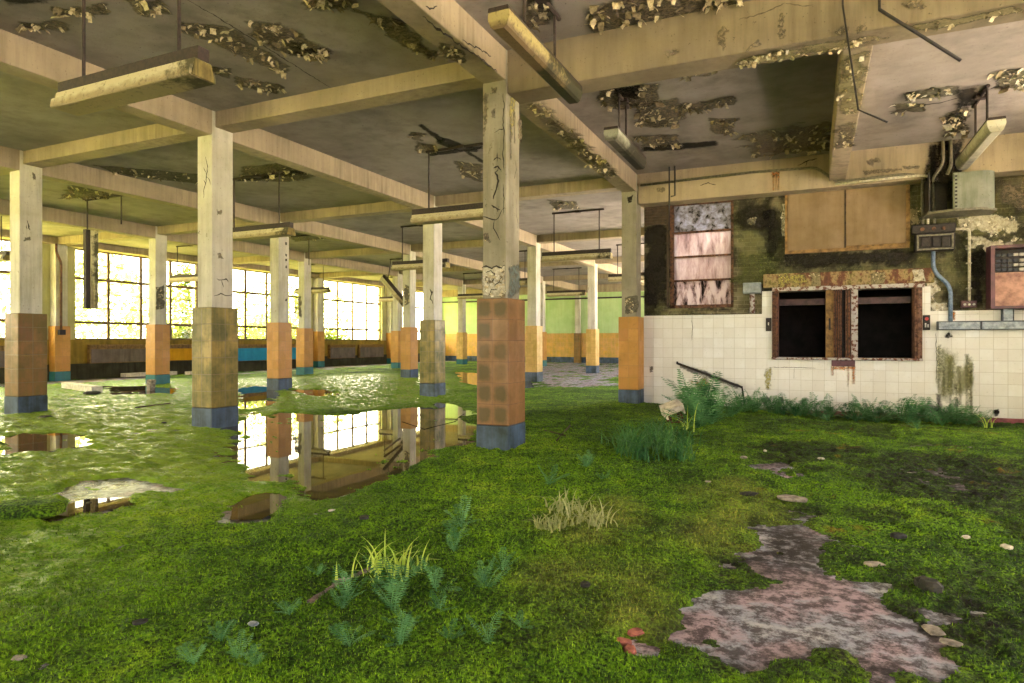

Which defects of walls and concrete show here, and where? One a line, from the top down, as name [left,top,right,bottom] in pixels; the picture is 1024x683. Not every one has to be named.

peeling [584,0,743,35]
peeling [94,165,198,184]
peeling [181,20,332,96]
crack [483,100,518,240]
peeling [528,102,616,180]
peeling [596,13,888,159]
peeling [890,86,959,116]
peeling [939,107,970,139]
water stain [730,196,914,270]
peeling [958,214,1022,252]
peeling [482,266,505,299]
water stain [914,349,972,415]